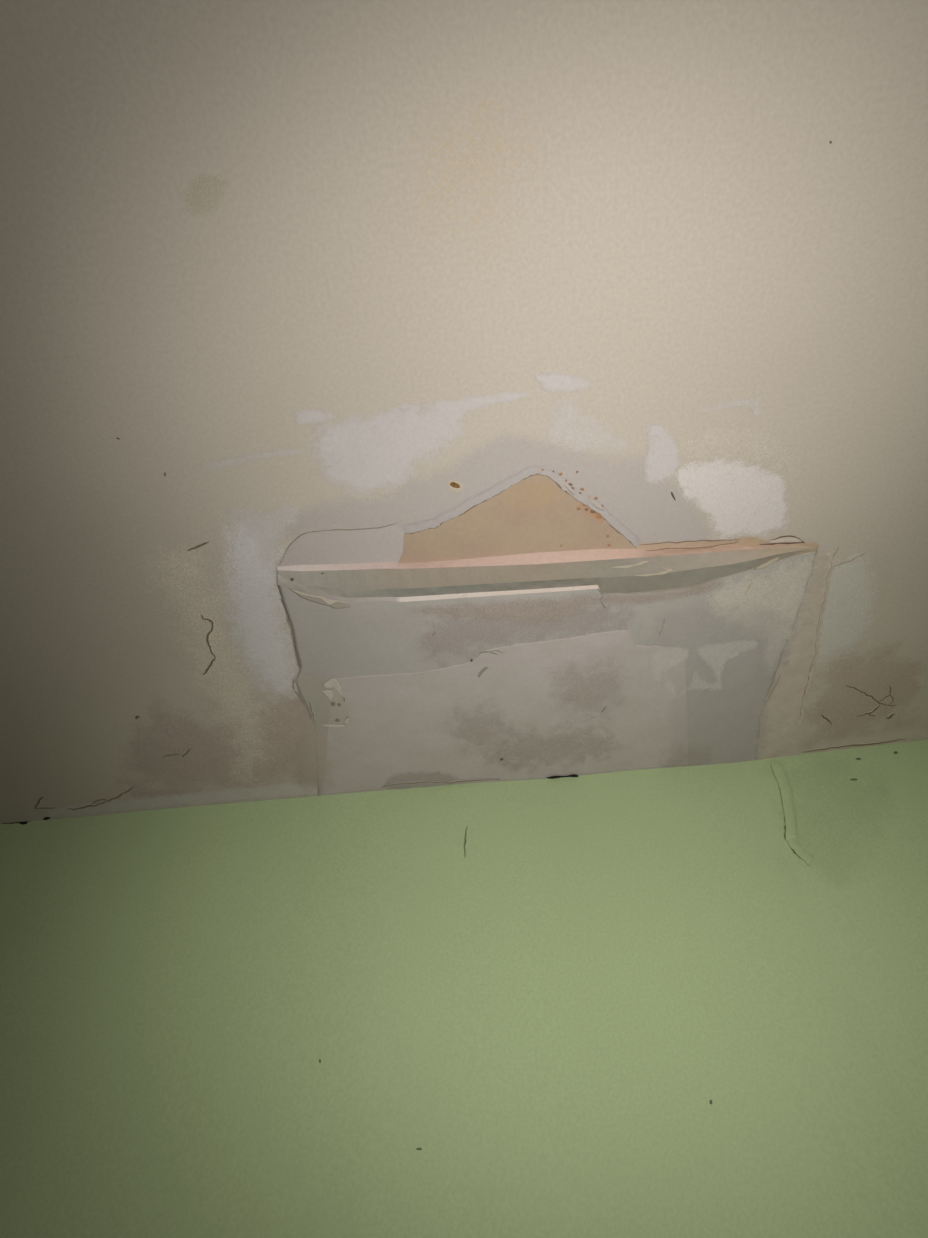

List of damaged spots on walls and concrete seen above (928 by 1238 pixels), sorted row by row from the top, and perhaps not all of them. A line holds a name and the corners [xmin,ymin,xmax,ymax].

peeling [398,464,642,563]
crack [201,615,216,675]
crack [821,685,896,724]
leakage [798,633,928,753]